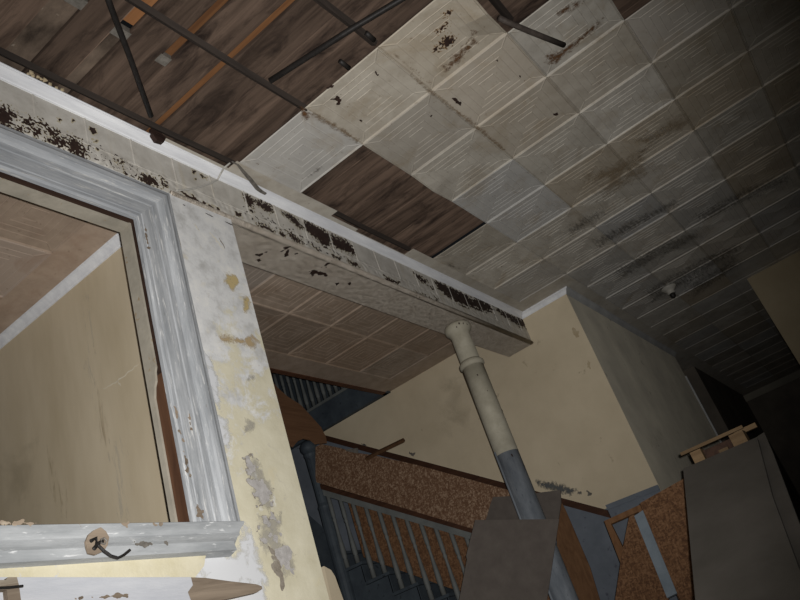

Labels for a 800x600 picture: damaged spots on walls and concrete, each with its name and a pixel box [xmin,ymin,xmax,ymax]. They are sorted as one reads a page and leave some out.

corrosion [432,9,475,71]
corrosion [547,26,594,64]
peeling [0,100,169,190]
peeling [233,192,361,277]
peeling [413,271,527,330]
peeling [196,453,295,600]